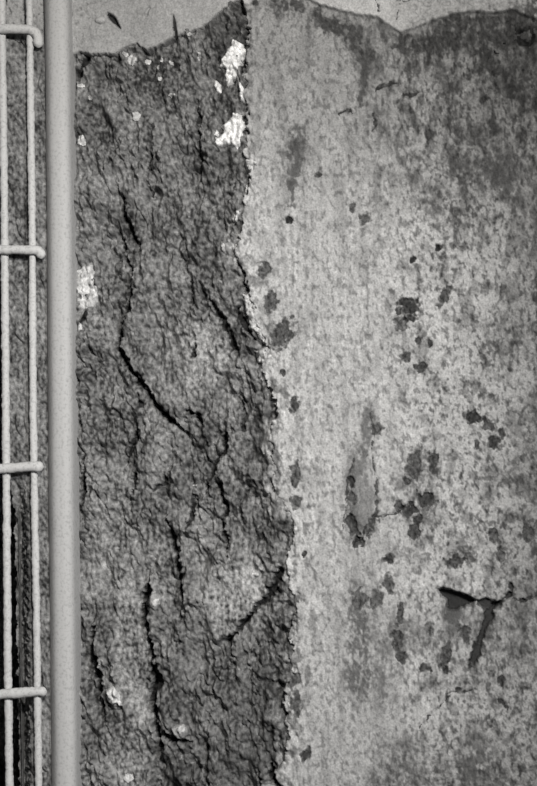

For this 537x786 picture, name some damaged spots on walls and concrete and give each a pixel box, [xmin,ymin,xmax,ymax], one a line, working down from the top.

leakage [271,0,376,106]
leakage [390,0,537,79]
leakage [283,125,305,201]
flaking render [349,204,369,225]
spalling [0,39,52,786]
spalling [74,0,302,786]
flaking render [352,553,395,610]
flaking render [443,551,475,568]
flaking render [488,528,505,563]
flaking render [390,602,406,665]
flaking render [419,642,452,674]
flaking render [439,588,474,643]